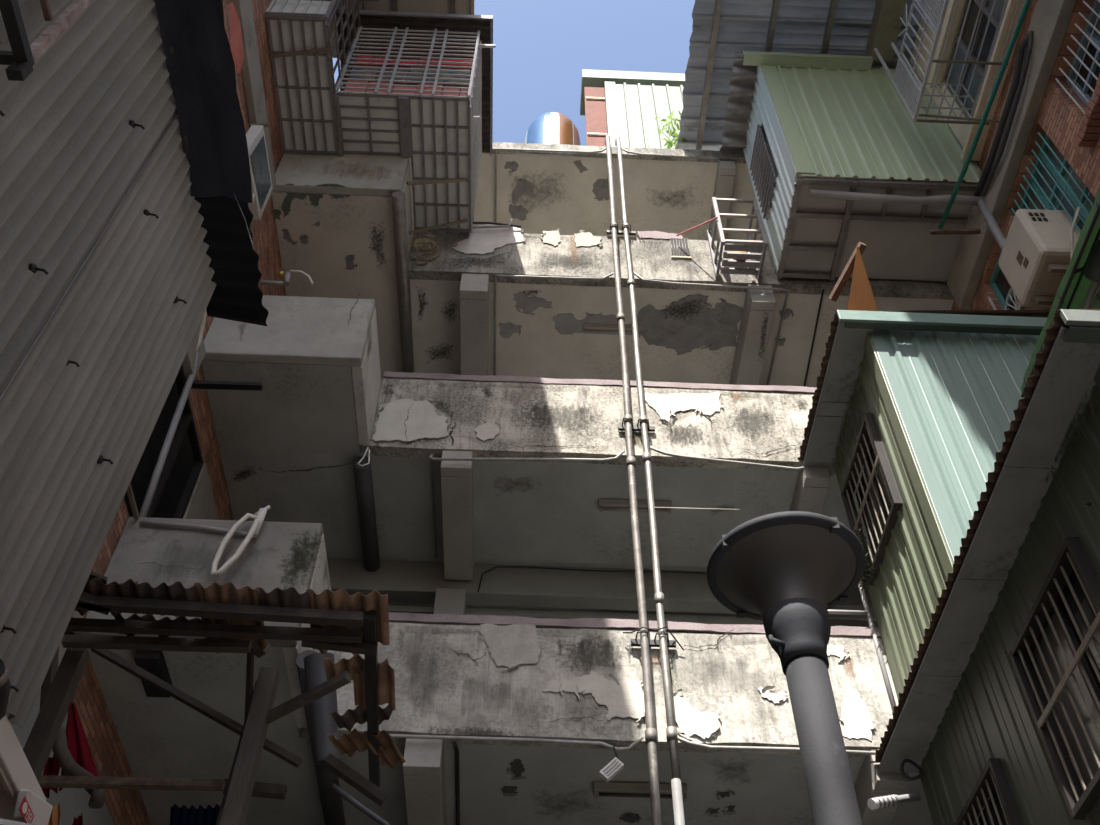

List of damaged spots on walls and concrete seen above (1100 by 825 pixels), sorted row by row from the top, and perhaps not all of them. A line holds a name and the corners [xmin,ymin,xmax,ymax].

spalling [410,161,535,266]
peeling [541,228,561,246]
peeling [574,230,603,247]
peeling [644,391,724,423]
leakage [282,532,321,585]
peeling [479,624,543,670]
spalling [543,671,645,722]
spalling [672,689,721,741]
spalling [754,685,788,704]
peeling [839,682,876,741]